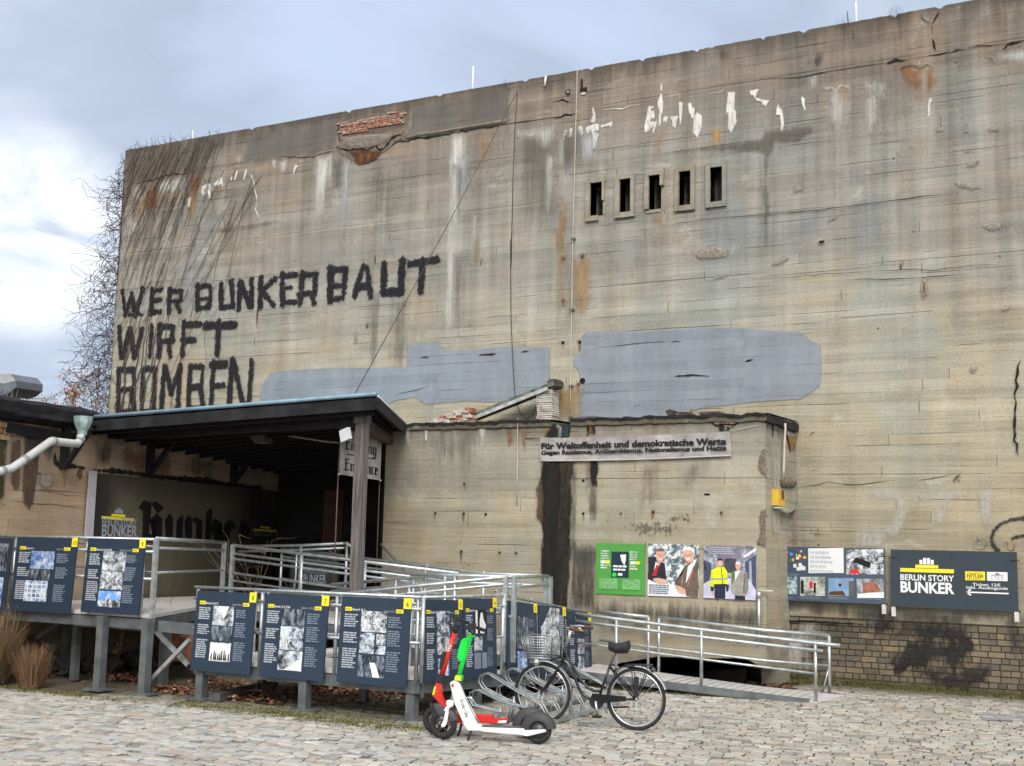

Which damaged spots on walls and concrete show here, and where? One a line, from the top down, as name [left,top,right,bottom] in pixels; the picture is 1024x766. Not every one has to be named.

crack [768,12,1024,79]
spalling [336,109,408,165]
crack [284,88,639,164]
water stain [446,136,467,327]
crack [1013,360,1021,456]
water stain [536,461,617,622]
water stain [633,606,754,624]